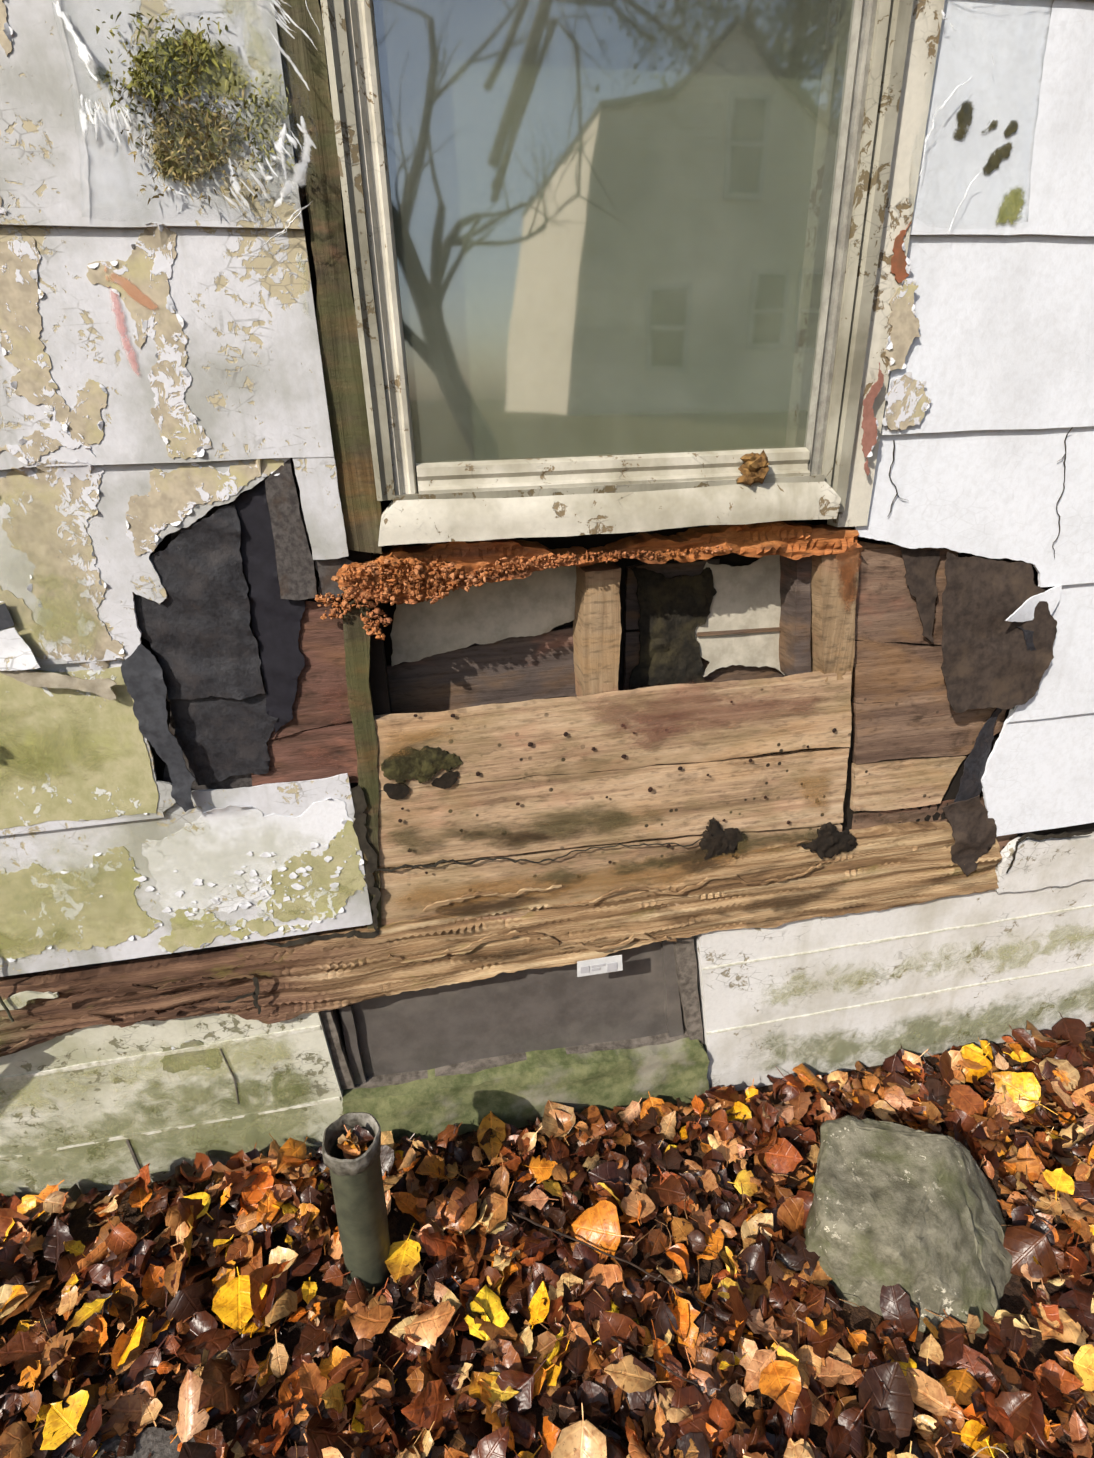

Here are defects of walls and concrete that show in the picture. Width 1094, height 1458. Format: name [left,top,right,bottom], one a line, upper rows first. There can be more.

peeling [0,0,13,56]
peeling [861,223,932,476]
peeling [86,223,284,556]
crack [1052,427,1073,558]
spalling [314,525,760,691]
damp [388,809,658,854]
damp [617,831,817,874]
damp [444,897,541,916]
damp [542,870,577,883]
damp [743,885,836,911]
damp [460,947,537,964]
damp [147,1073,303,1106]